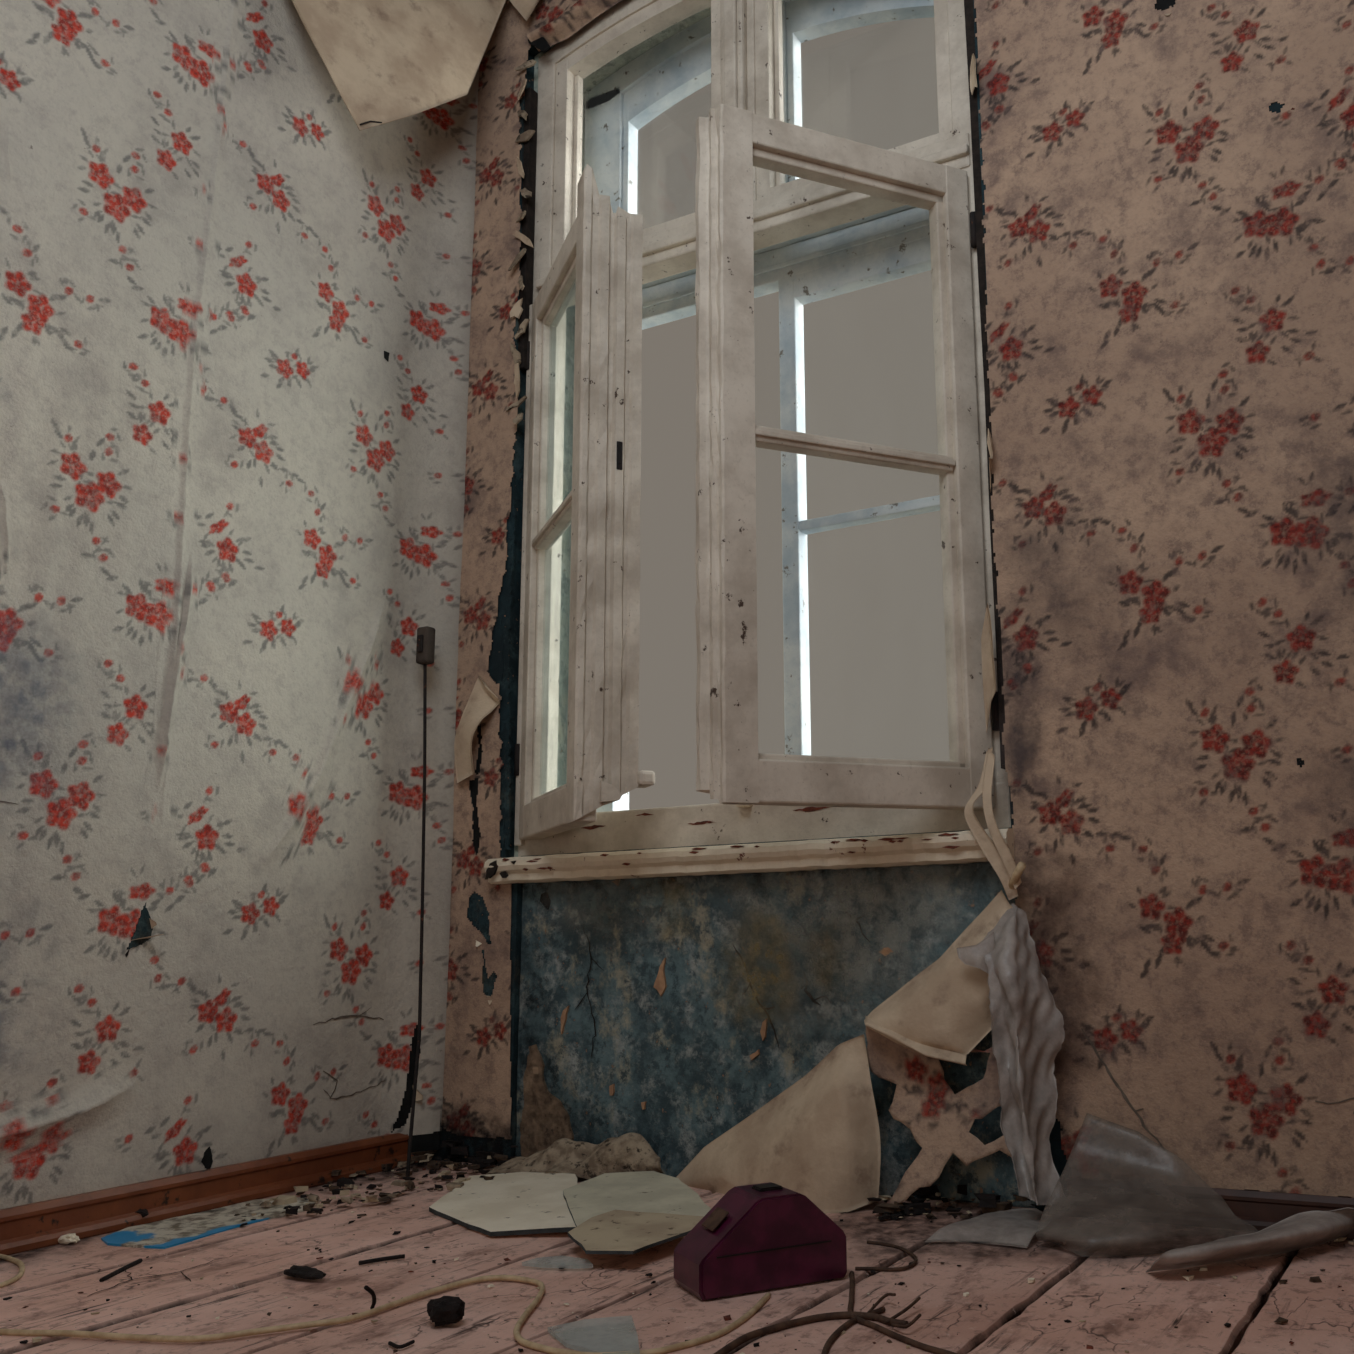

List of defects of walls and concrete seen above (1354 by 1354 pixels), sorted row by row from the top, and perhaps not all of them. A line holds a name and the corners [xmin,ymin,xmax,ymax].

peeling [831,837,906,853]
peeling [654,958,667,996]
spalling [520,1044,574,1157]